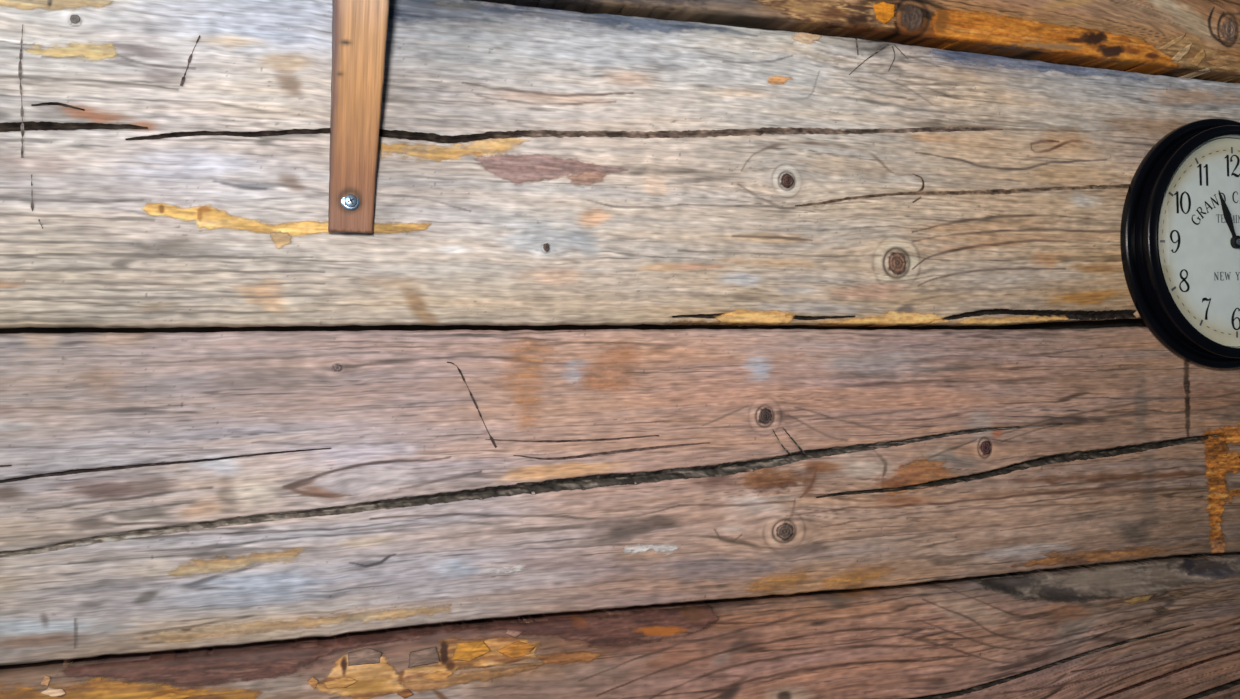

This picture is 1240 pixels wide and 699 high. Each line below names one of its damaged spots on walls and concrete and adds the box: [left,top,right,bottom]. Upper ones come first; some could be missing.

peeling [932,9,1240,83]
crack [0,24,330,229]
crack [379,127,1003,143]
peeling [143,203,331,248]
peeling [373,223,431,233]
crack [0,362,1240,557]
peeling [0,675,261,699]
peeling [307,616,601,699]
crack [908,624,1194,699]
crack [1098,650,1240,699]